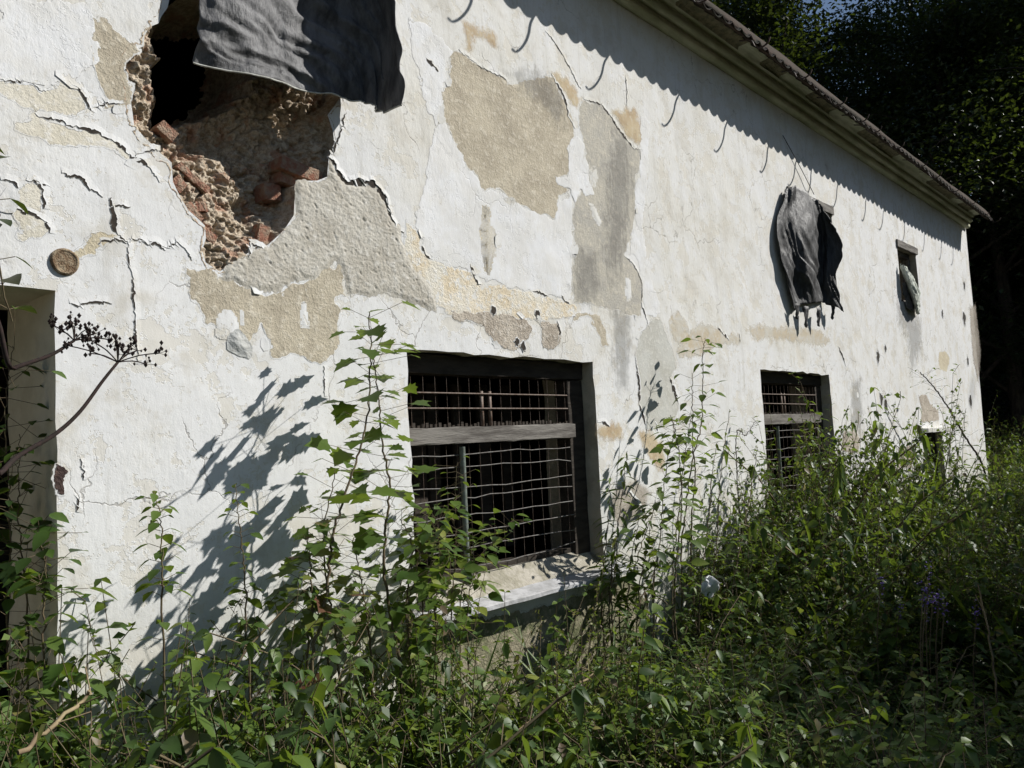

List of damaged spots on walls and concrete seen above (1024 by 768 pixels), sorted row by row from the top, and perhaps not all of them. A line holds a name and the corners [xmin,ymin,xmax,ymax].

crack [0,75,164,183]
crack [0,166,196,361]
spalling [0,0,679,431]
flaking render [918,394,939,423]
flaking render [51,463,69,497]
crack [73,457,92,513]